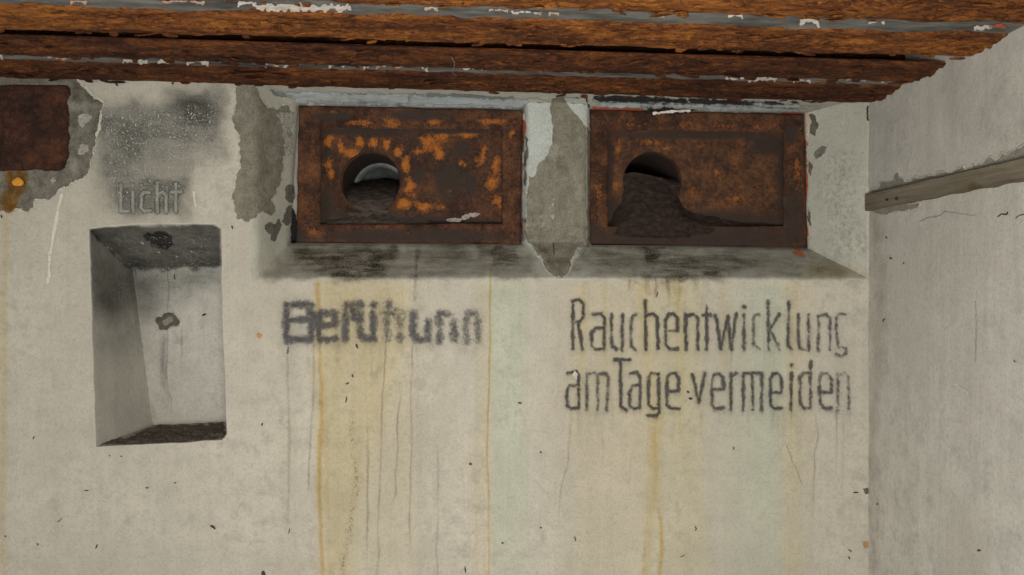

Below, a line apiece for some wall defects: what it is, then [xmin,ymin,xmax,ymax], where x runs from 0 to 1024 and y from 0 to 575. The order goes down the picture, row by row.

spalling [0,77,105,218]
spalling [231,85,295,241]
spalling [521,96,691,278]